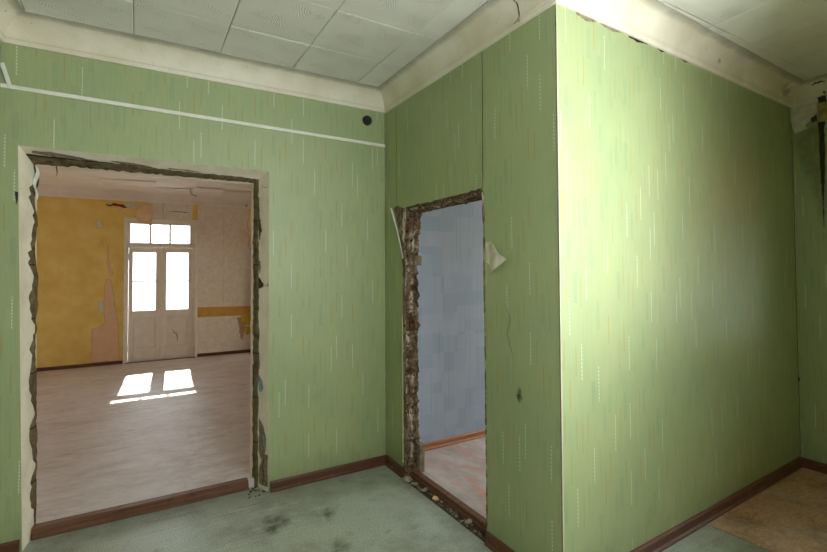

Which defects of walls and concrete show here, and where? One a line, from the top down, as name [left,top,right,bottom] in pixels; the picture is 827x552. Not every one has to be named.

flaking render [26,151,268,524]